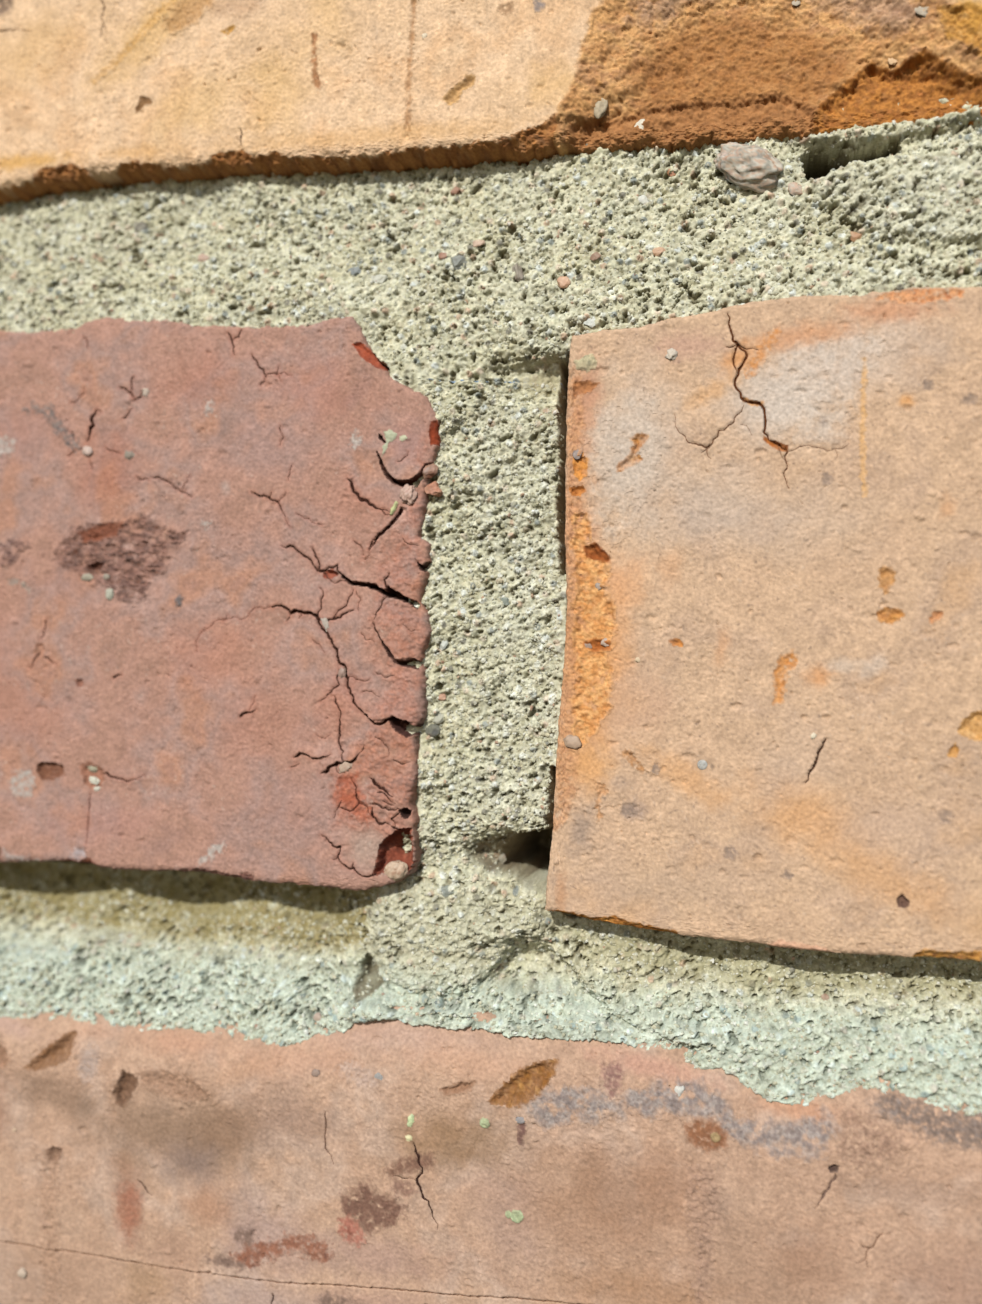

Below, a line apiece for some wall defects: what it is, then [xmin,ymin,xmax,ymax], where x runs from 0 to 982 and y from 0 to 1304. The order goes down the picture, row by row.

spalling [0,0,982,206]
crack [674,313,849,488]
spalling [50,512,189,604]
crack [195,425,418,877]